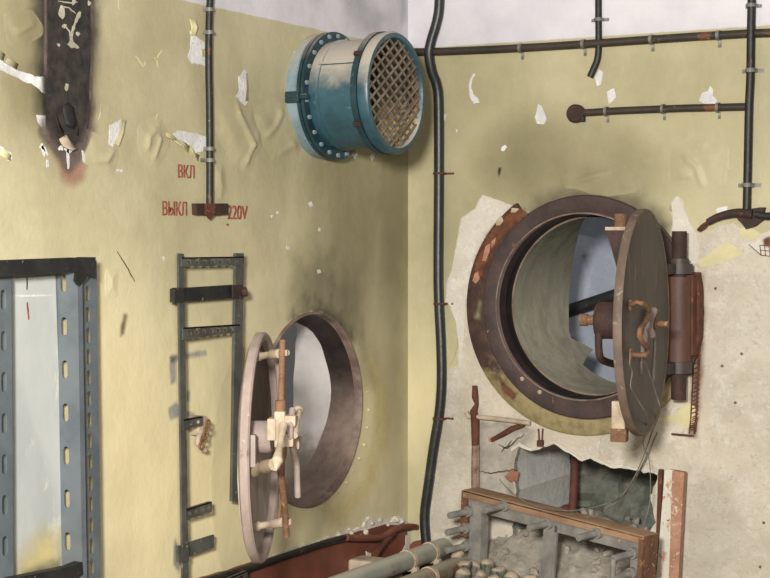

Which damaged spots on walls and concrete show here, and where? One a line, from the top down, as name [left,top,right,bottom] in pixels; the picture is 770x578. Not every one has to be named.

peeling [188,19,205,66]
peeling [0,51,43,93]
peeling [236,69,248,106]
peeling [469,74,480,103]
peeling [535,104,547,124]
peeling [108,119,126,147]
peeling [166,131,206,161]
rust [472,206,527,283]
rust [499,378,515,399]
peeling [418,195,770,578]
spalling [267,516,408,558]